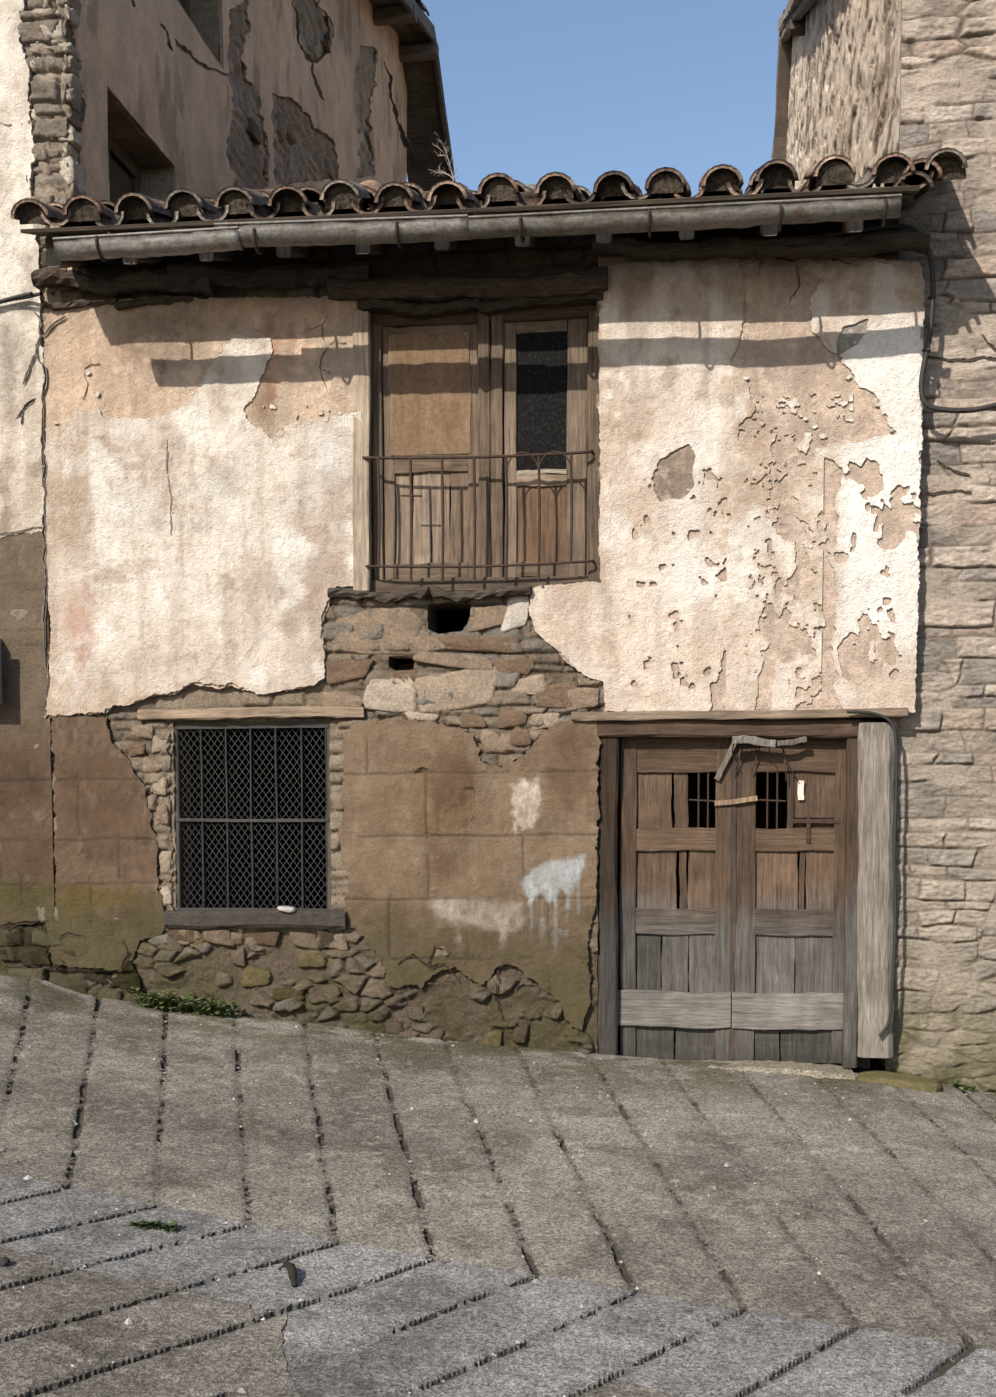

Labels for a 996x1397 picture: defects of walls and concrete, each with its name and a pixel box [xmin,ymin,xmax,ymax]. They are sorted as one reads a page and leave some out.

crack [131,0,229,76]
spalling [226,0,338,189]
spalling [354,46,376,177]
flaking render [44,301,354,456]
flaking render [644,444,700,502]
flaking render [731,260,896,709]
spalling [323,596,605,767]
spalling [113,717,175,911]
water stain [525,860,583,900]
spalling [0,921,595,1055]